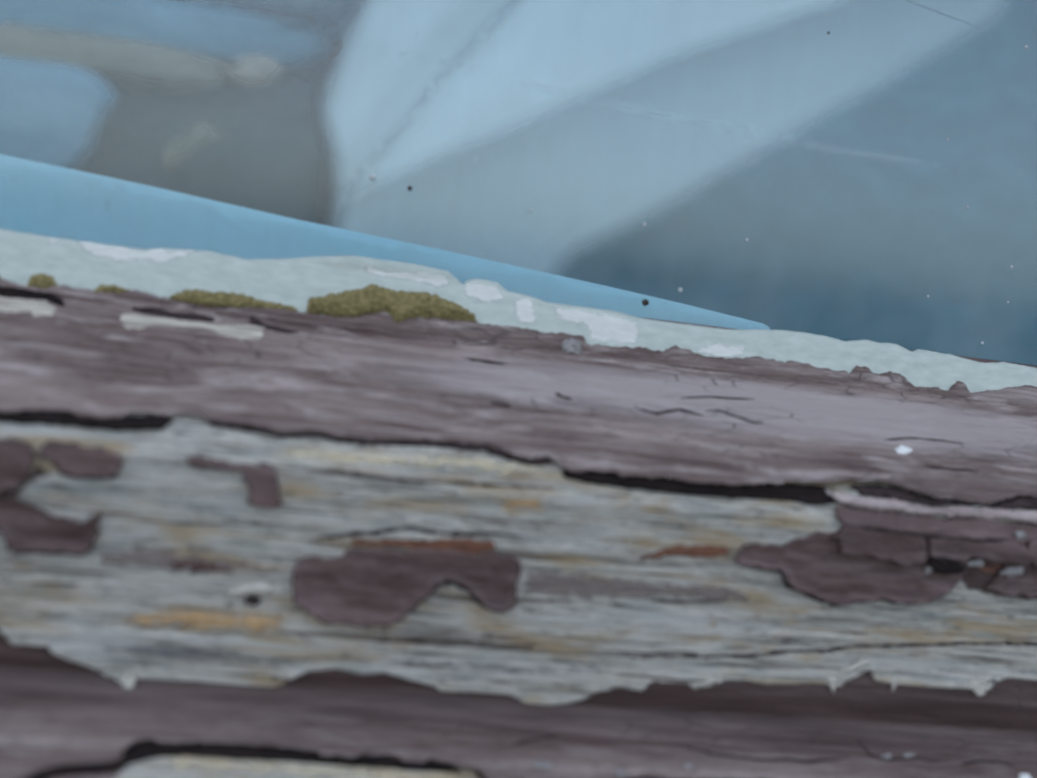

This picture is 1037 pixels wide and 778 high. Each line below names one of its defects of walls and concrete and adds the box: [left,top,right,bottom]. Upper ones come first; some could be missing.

crack [0,410,173,431]
crack [208,421,1037,575]
peeling [0,414,1037,705]
crack [29,741,483,778]
crack [679,739,1014,766]